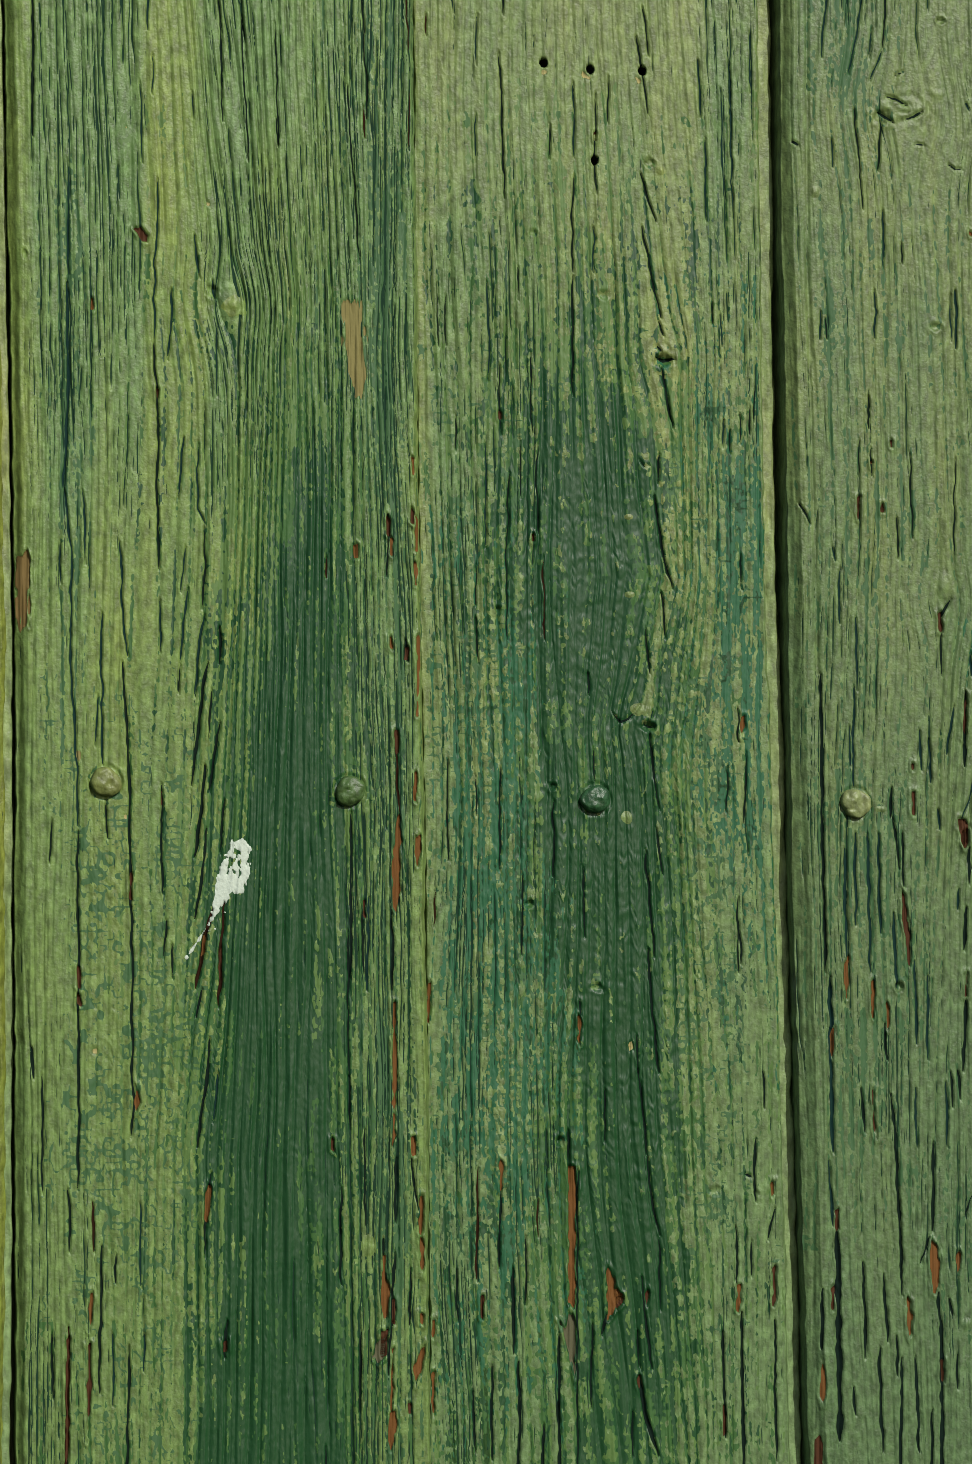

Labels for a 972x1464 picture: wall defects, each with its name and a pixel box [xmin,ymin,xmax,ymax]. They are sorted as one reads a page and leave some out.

peeling [341,299,368,399]
crack [18,0,771,1464]
crack [790,0,972,1464]
peeling [392,815,421,911]
peeling [958,819,968,848]
peeling [560,1166,576,1374]
peeling [606,1268,623,1320]
crack [713,1065,783,1464]
peeling [930,1241,961,1294]